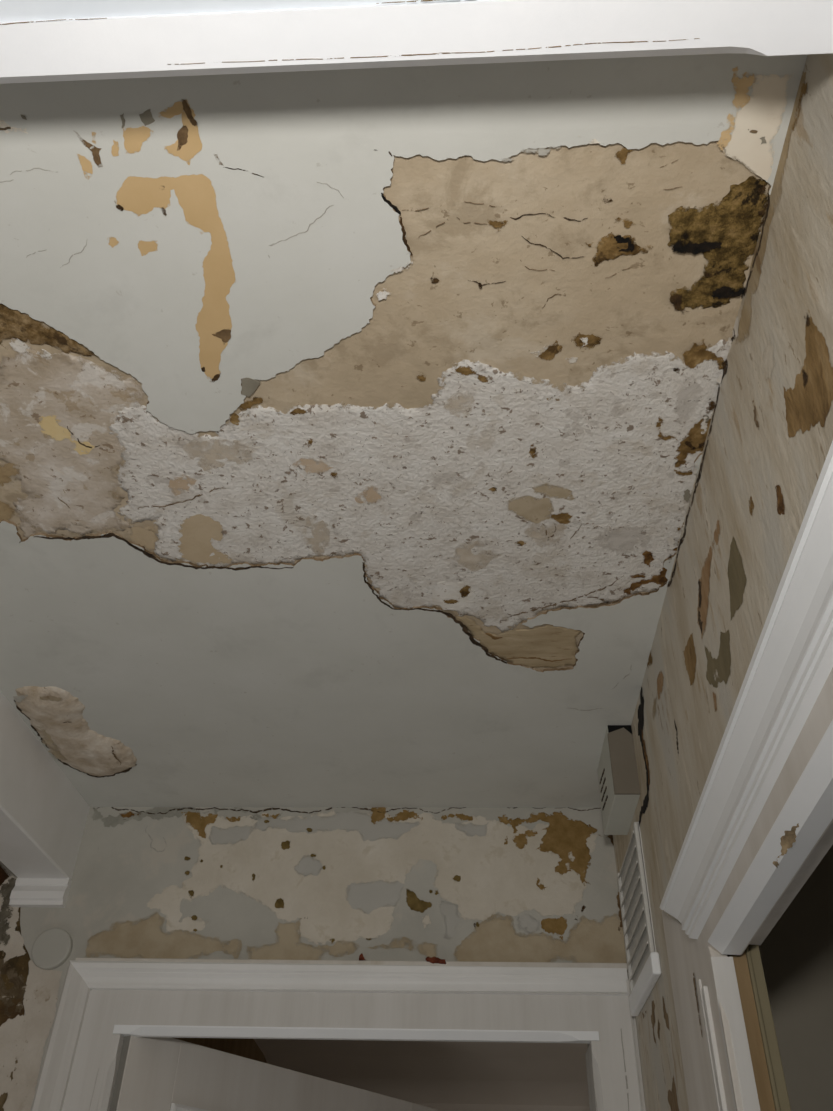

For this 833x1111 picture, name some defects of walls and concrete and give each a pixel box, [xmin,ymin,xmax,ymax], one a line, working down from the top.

crack [0,114,28,134]
water stain [735,72,807,346]
peeling [0,67,794,688]
water stain [673,339,725,373]
peeling [783,311,833,438]
peeling [147,807,614,945]
peeling [773,823,799,868]
flaking render [0,876,62,1111]